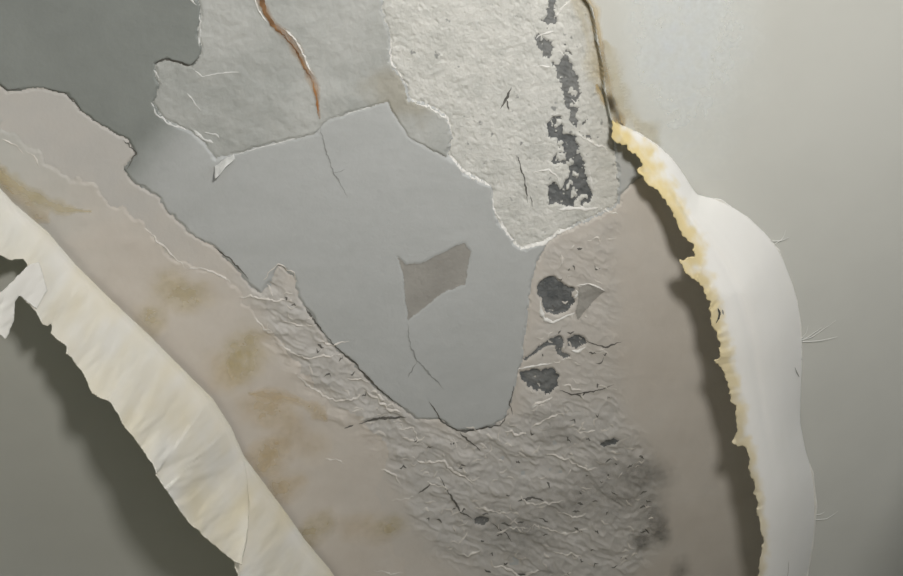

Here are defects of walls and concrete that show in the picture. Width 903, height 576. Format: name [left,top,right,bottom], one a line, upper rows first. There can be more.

peeling [0,188,334,576]
rust [254,0,319,115]
peeling [0,0,575,431]
flaking render [382,0,824,576]
damp [586,0,625,126]